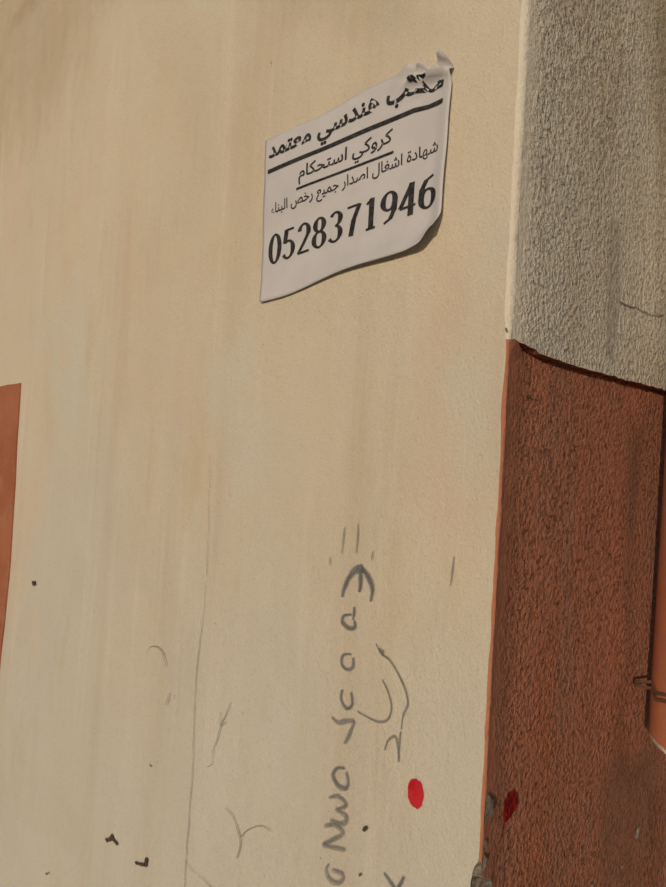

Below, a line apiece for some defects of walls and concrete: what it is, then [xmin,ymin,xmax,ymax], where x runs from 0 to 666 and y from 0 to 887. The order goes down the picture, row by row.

spalling [470,840,493,887]